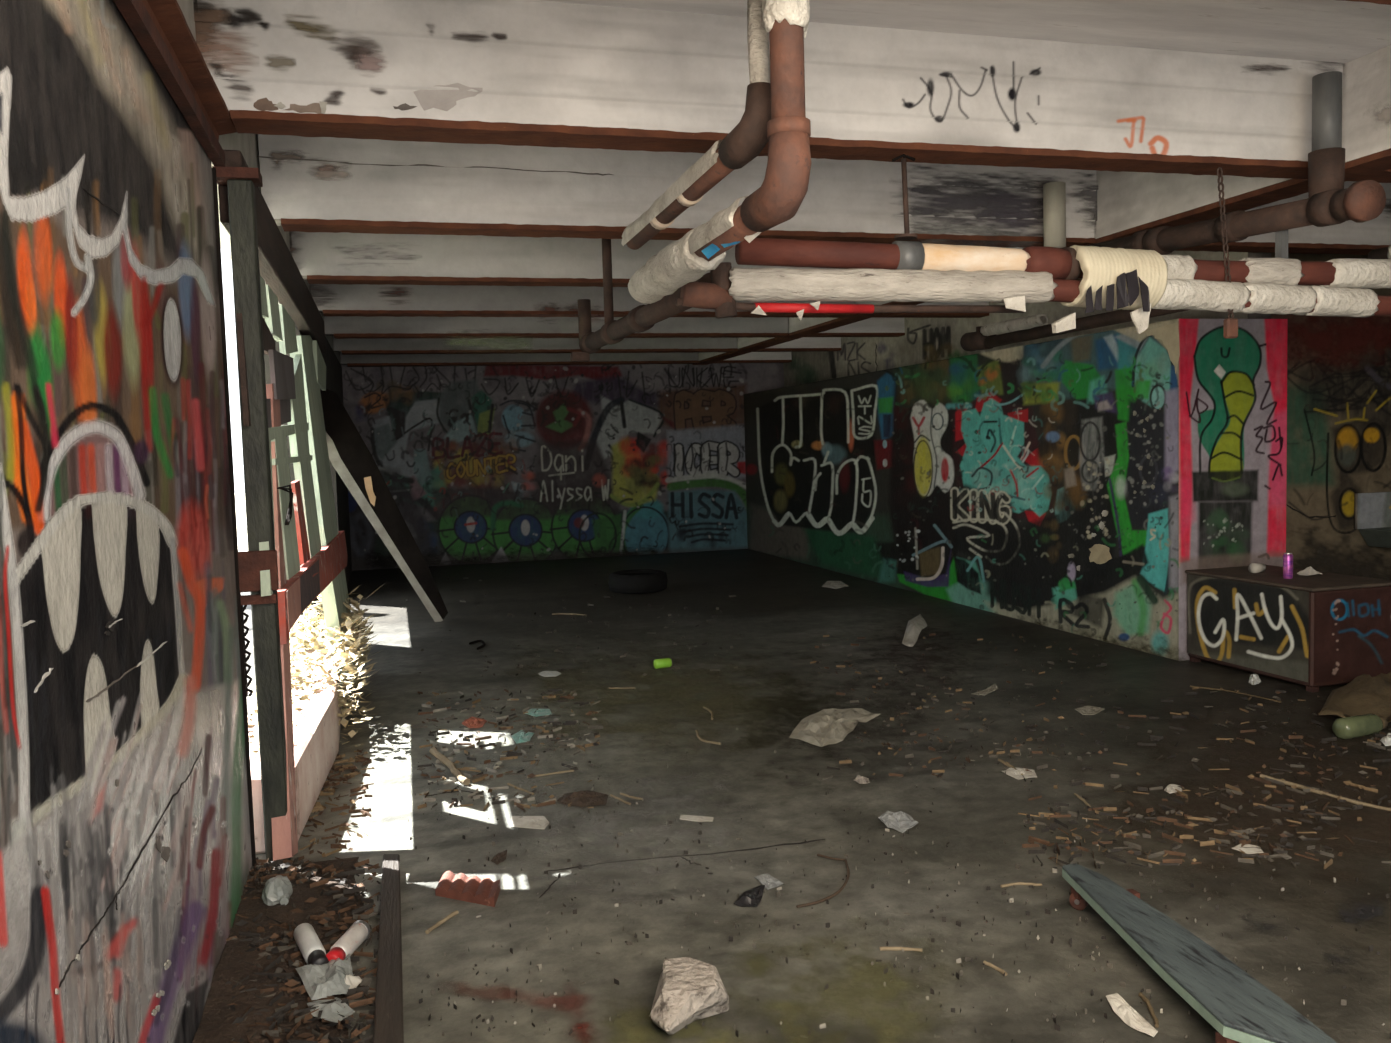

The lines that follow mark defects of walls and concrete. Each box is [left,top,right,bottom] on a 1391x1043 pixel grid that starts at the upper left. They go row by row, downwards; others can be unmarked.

peeling [253,98,327,114]
spalling [393,83,483,111]